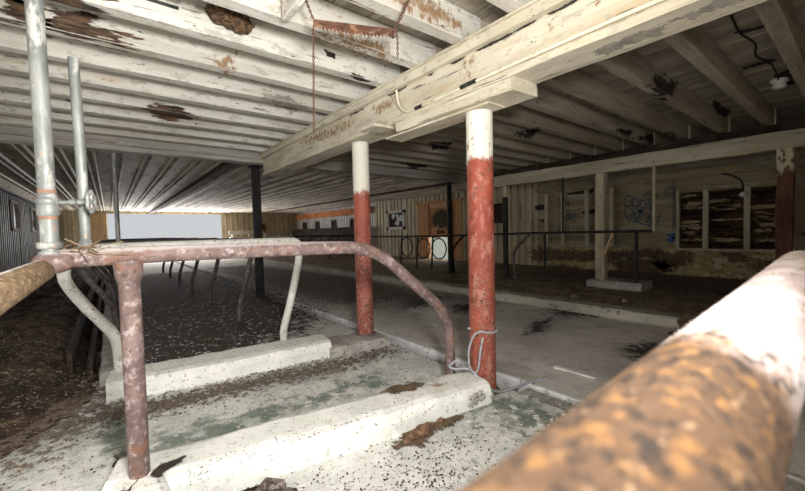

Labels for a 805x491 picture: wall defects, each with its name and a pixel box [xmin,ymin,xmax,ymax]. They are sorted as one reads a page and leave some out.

peeling [0,0,26,26]
peeling [44,0,146,54]
damp [621,340,659,361]